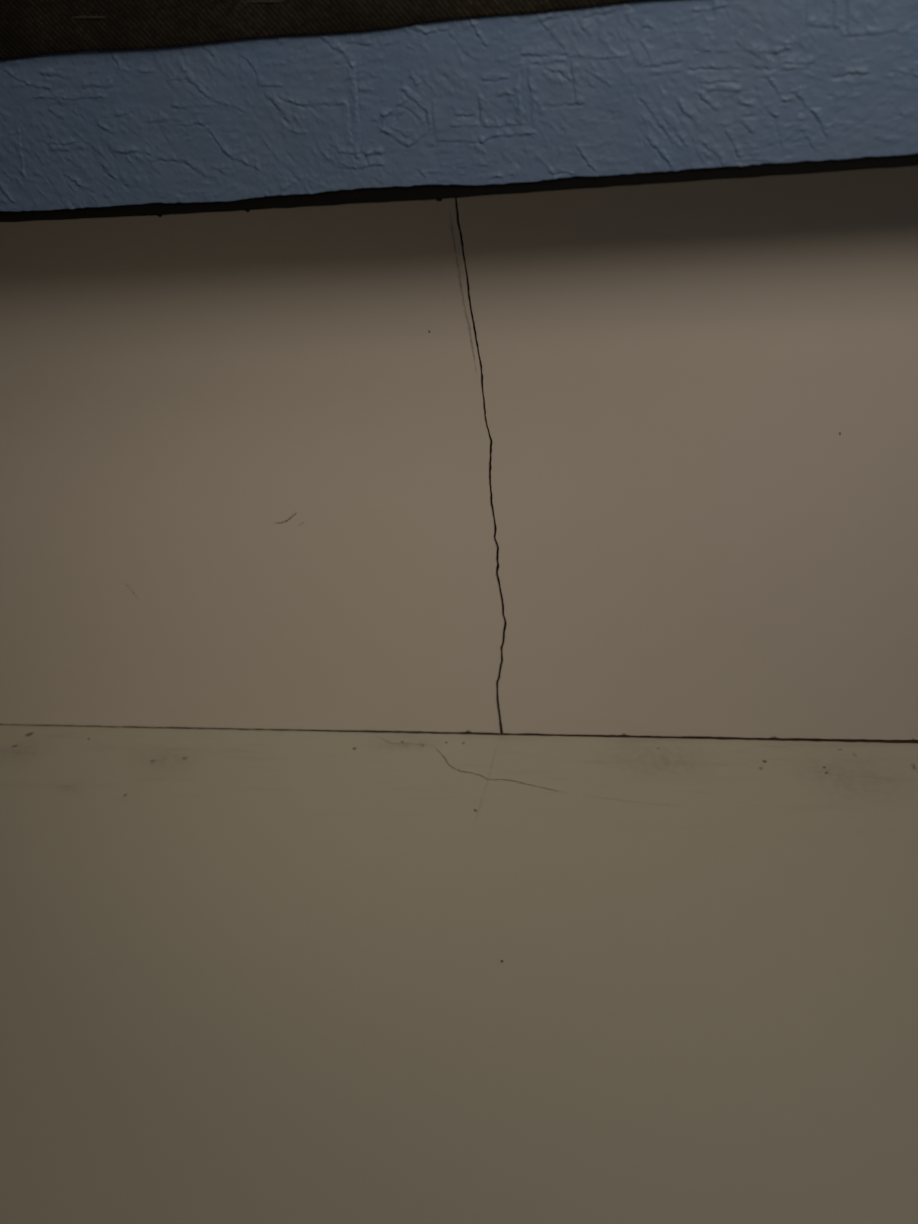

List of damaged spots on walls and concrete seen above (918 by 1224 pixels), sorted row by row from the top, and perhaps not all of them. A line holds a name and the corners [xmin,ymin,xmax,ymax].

crack [0,198,918,744]